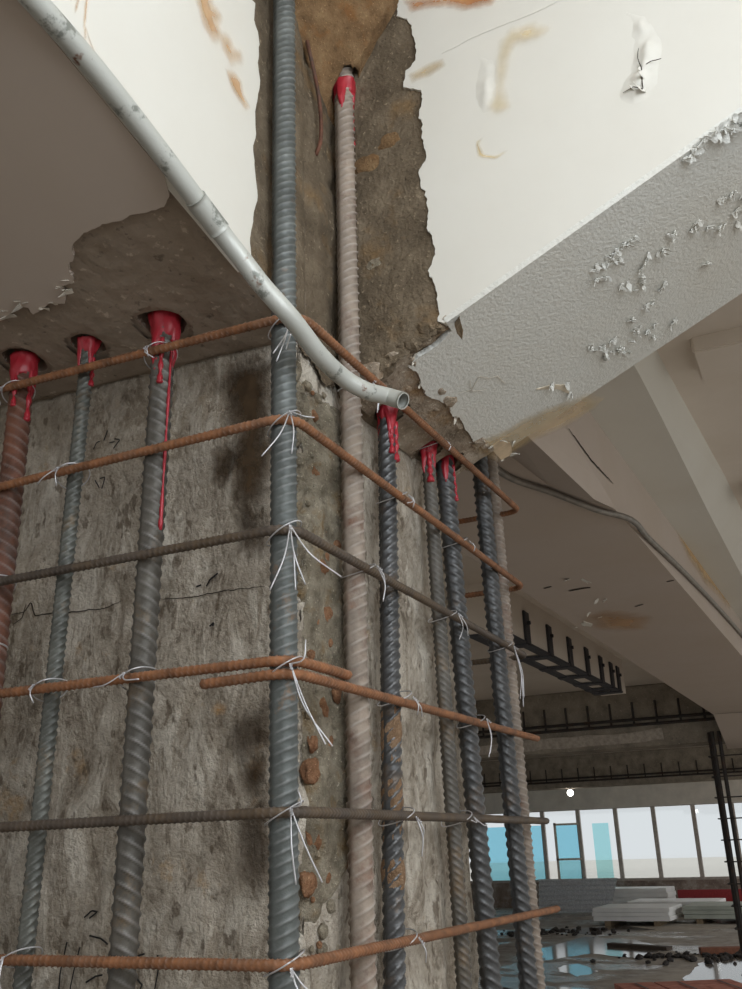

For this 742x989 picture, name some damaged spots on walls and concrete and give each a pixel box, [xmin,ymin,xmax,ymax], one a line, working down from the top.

peeling [682,111,742,164]
peeling [689,191,742,236]
peeling [588,230,677,361]
crack [569,429,613,483]
spalling [0,0,546,989]
crack [12,601,121,624]
crack [166,586,265,599]